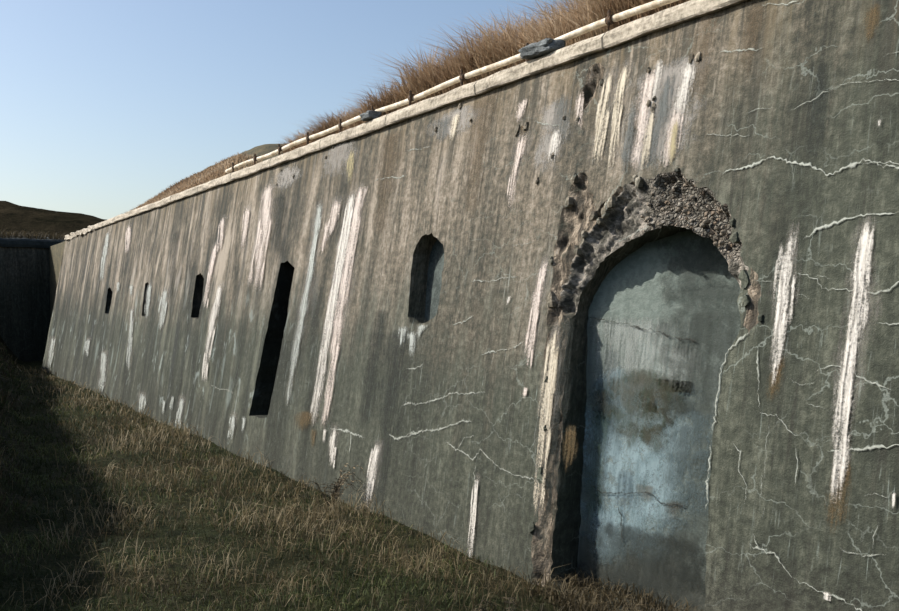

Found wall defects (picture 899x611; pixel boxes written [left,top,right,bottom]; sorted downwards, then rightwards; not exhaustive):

damp [202,218,224,380]
damp [241,185,273,287]
damp [287,187,368,468]
damp [593,66,627,165]
spalling [528,52,764,586]
damp [772,239,796,380]
crack [723,156,899,176]
crack [807,213,893,237]
damp [831,225,873,498]
crack [390,391,532,481]
crack [593,333,804,542]
crack [831,444,899,453]